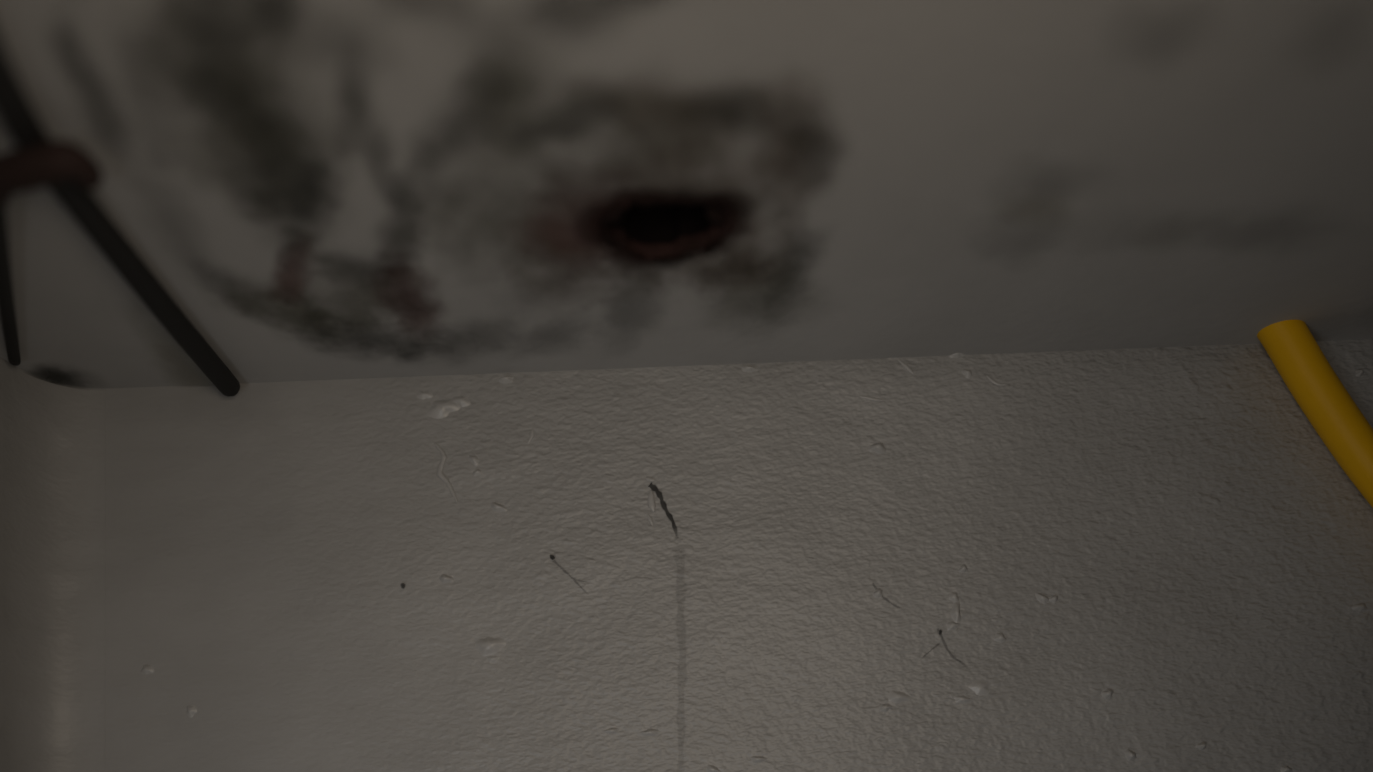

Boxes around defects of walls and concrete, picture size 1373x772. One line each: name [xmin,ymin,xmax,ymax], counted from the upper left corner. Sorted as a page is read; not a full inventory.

spalling [582,193,745,266]
crack [645,477,677,531]